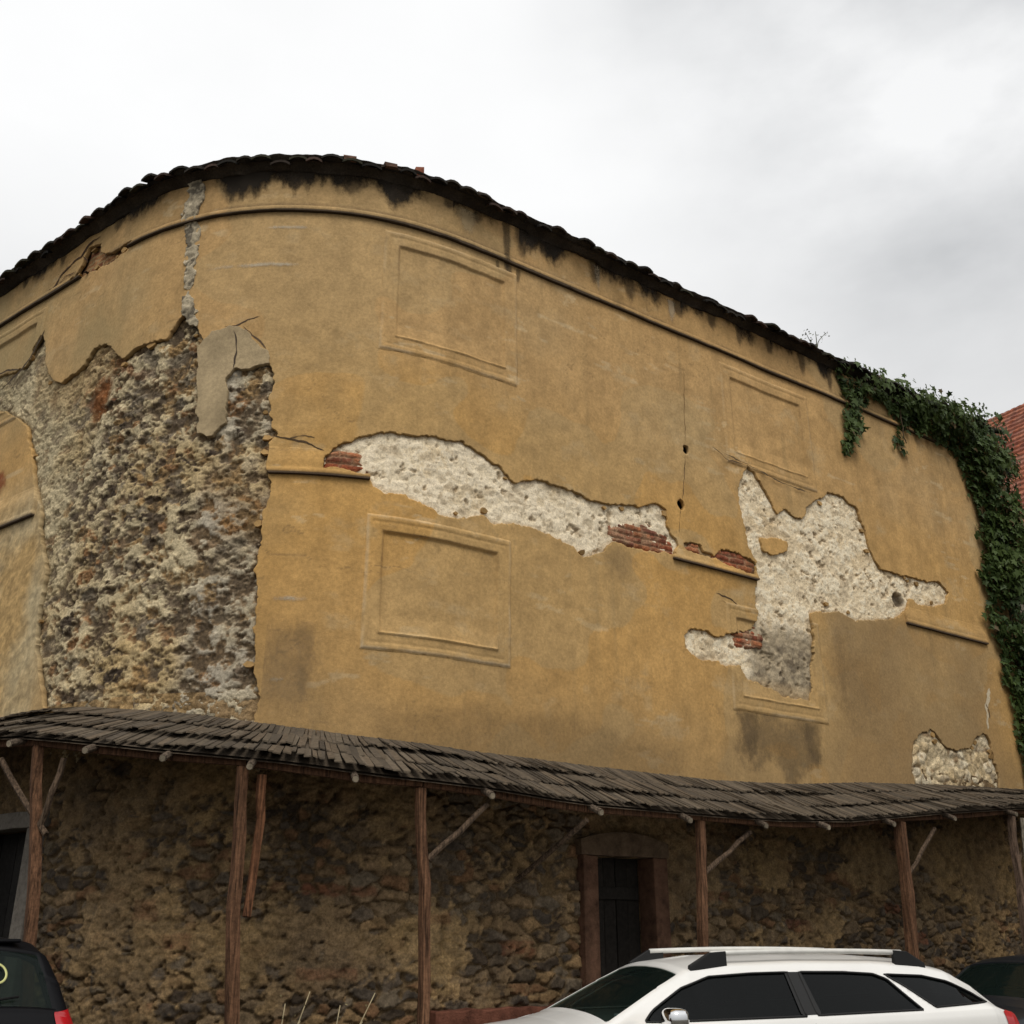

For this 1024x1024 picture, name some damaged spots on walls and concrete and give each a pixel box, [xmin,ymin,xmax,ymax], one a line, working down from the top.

leakage [217,171,421,205]
crack [48,238,98,291]
leakage [519,229,566,262]
leakage [595,262,703,316]
flaking render [0,318,278,721]
flaking render [323,433,947,701]
flaking render [911,730,997,788]